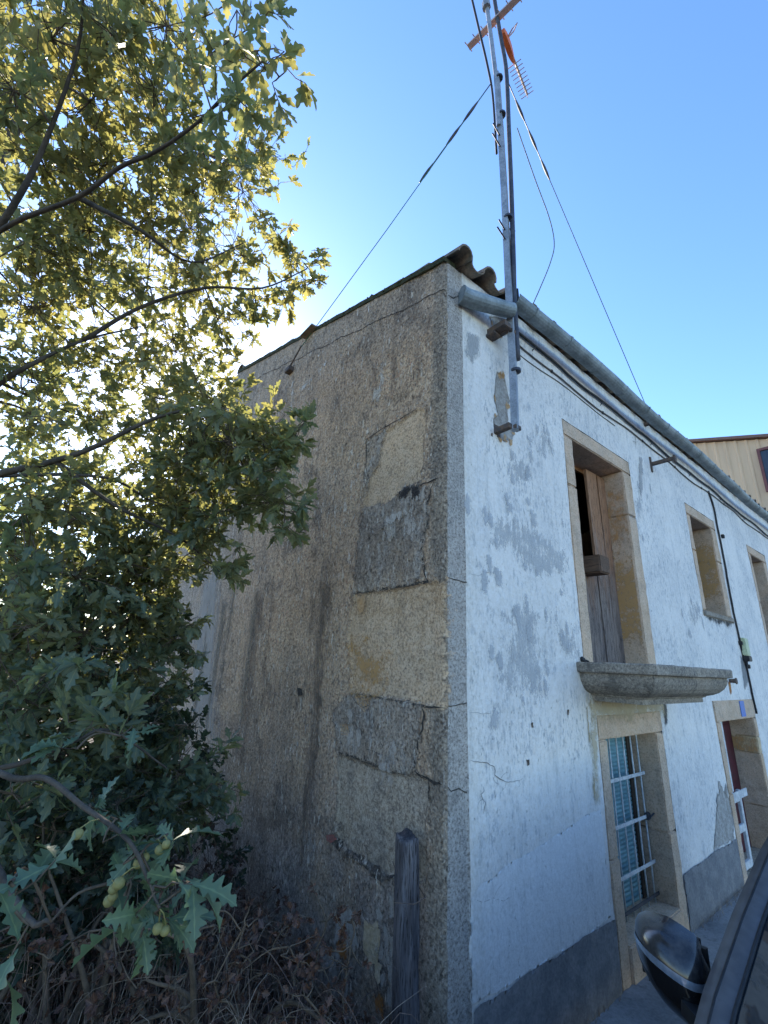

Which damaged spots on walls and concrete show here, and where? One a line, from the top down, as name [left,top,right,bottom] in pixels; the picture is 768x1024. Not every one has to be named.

peeling [464,372,569,596]
crack [333,693,520,809]
flaking render [714,781,734,851]